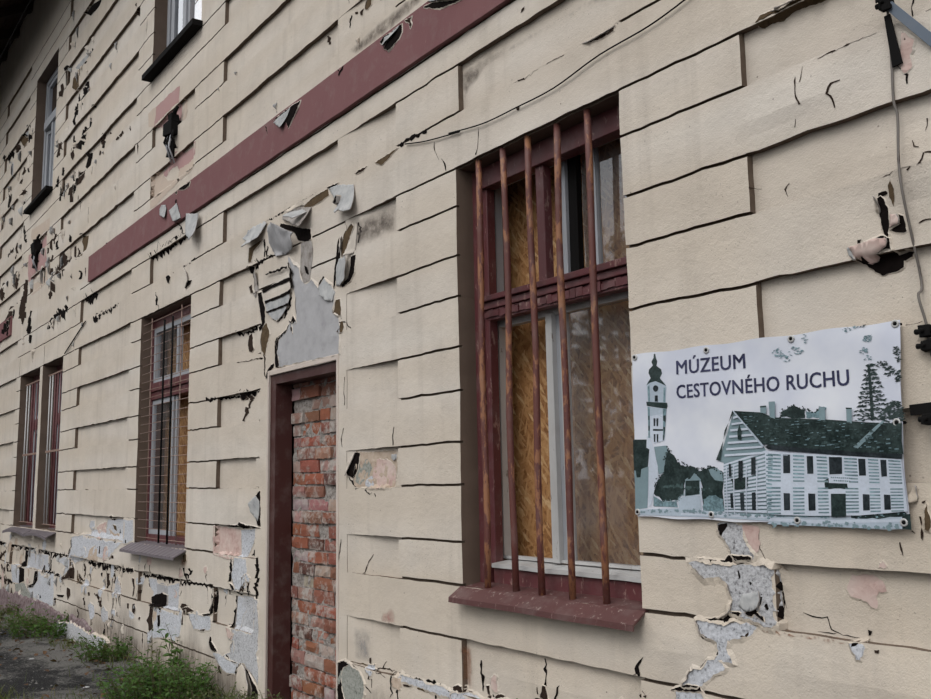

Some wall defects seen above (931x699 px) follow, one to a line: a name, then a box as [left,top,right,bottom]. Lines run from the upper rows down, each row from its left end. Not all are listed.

crack [794,34,873,127]
peeling [898,31,916,84]
peeling [63,128,131,222]
peeling [0,151,89,327]
peeling [236,129,427,379]
peeling [847,234,915,277]
peeling [344,448,398,497]
spalling [0,490,261,699]
spalling [670,520,791,699]
crack [803,612,859,638]
peeling [846,560,889,611]